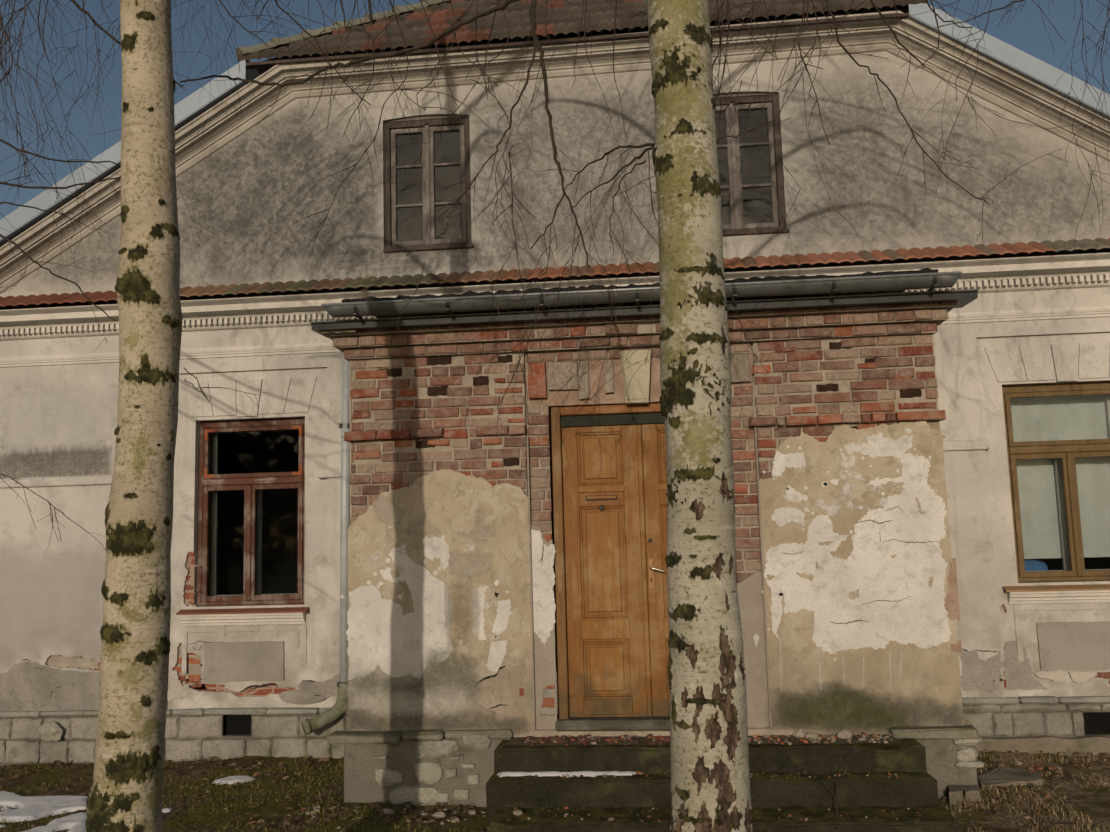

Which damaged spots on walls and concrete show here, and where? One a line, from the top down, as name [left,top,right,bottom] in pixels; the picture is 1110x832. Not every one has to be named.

flaking render [167,347,661,729]
crack [859,506,938,543]
peeling [730,334,1110,692]
crack [829,596,910,624]
flaking render [0,654,100,712]
water stain [356,655,474,694]
water stain [774,691,961,728]